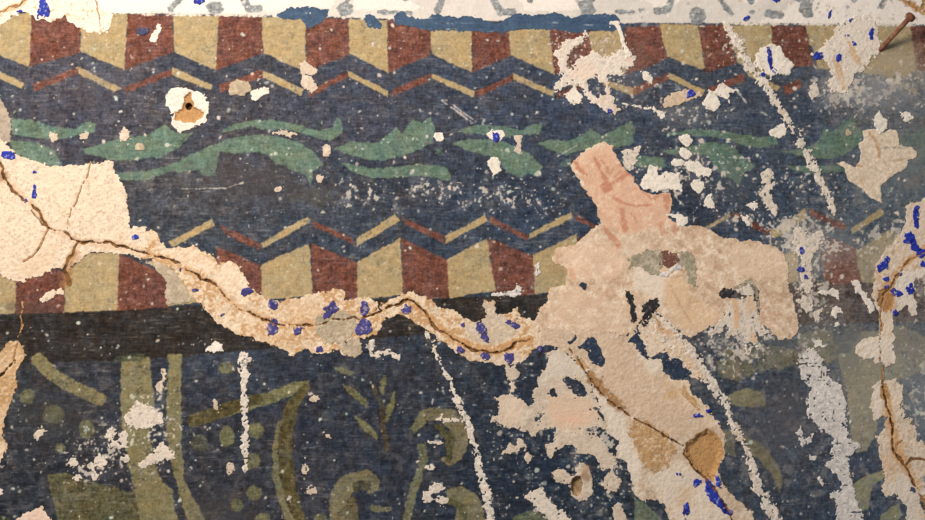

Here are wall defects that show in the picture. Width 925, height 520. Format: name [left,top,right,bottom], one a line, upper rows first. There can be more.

spalling [165,85,209,133]
leakage [723,21,837,216]
flaking render [837,110,917,203]
crack [0,300,24,377]
leakage [237,352,251,473]
crack [0,161,527,353]
flaking render [0,99,808,520]
leakage [425,331,495,520]
crack [569,348,732,520]
leakage [796,348,864,520]
flaking render [869,378,925,520]
crack [879,252,925,486]